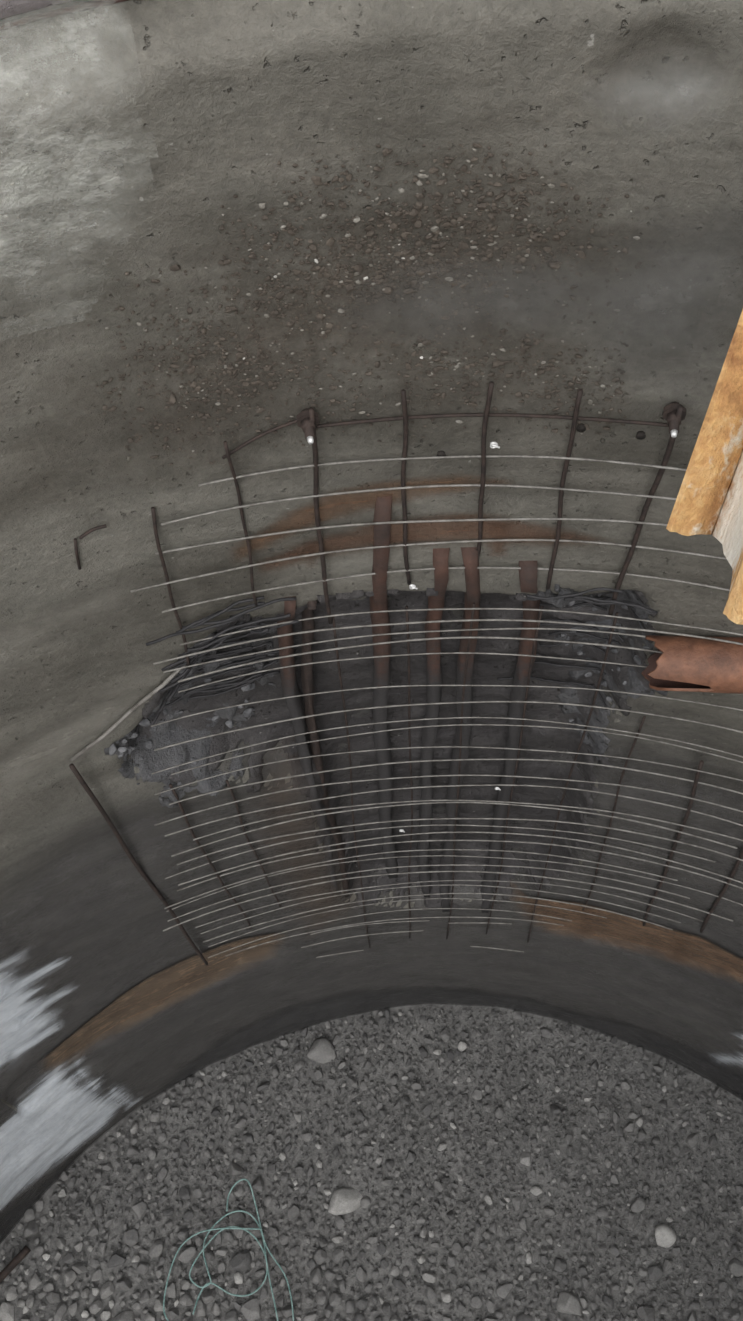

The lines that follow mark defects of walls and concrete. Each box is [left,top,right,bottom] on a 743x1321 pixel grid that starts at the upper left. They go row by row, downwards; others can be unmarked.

spalling [104,584,668,910]
corrosion [239,479,588,913]